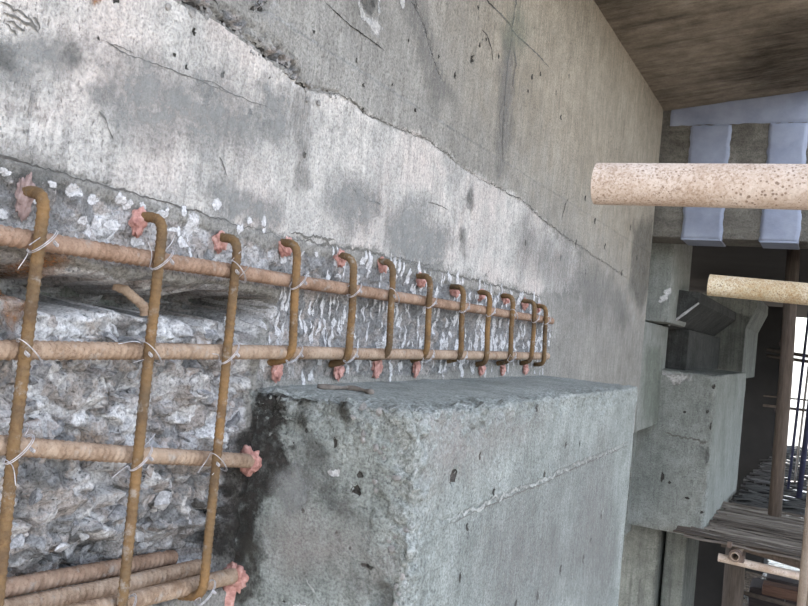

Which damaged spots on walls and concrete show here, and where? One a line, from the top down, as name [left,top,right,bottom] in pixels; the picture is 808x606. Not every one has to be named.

crack [100,39,276,112]
crack [327,4,381,48]
crack [411,0,439,74]
spalling [33,257,152,343]
spalling [156,281,291,345]
peeling [299,247,551,380]
spalling [22,359,143,446]
spalling [7,457,132,577]
leakage [195,383,316,604]
leakage [309,442,340,477]
spalling [133,359,638,606]
crack [441,446,627,528]